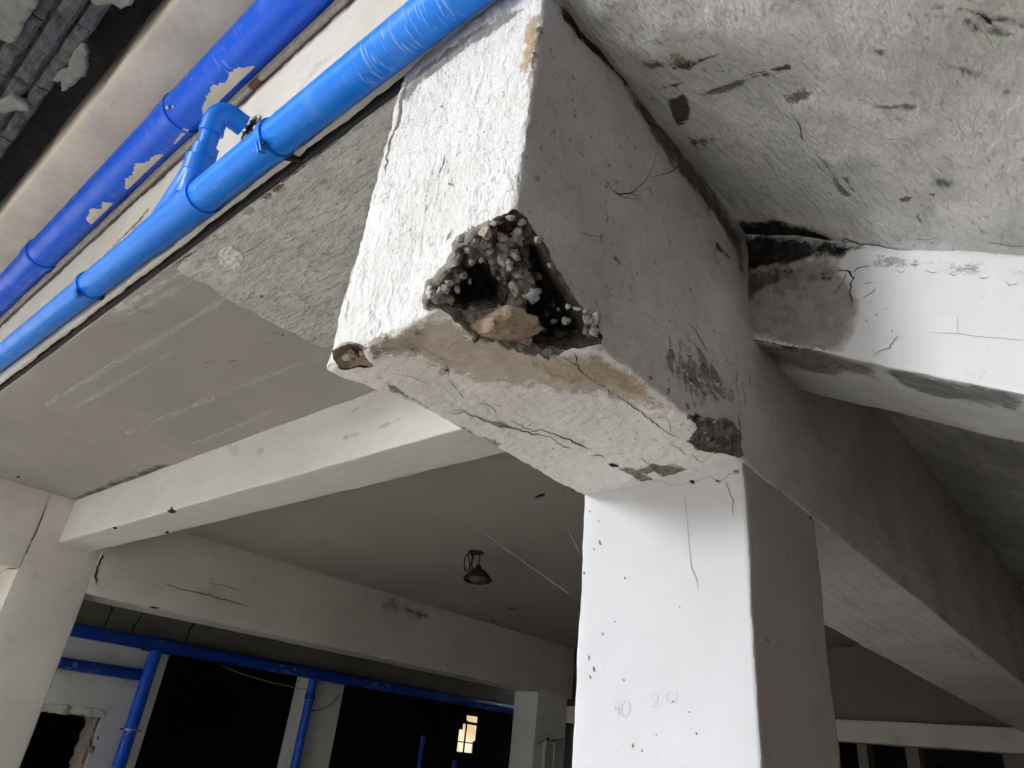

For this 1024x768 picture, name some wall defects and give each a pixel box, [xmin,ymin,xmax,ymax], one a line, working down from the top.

spalling [422,209,603,361]
spalling [332,342,373,368]
crack [370,338,603,457]
water stain [371,321,663,408]
spalling [647,339,743,458]
peeling [608,458,686,482]
crack [5,505,47,570]
crack [166,583,248,607]